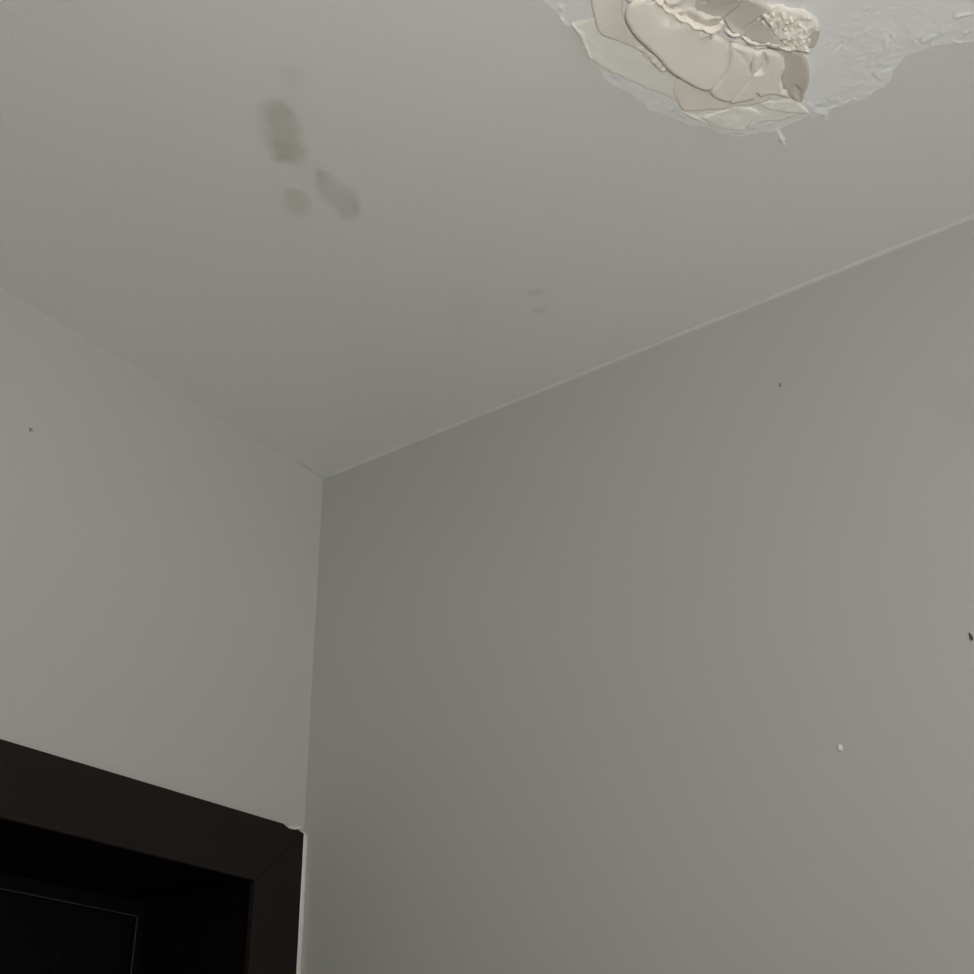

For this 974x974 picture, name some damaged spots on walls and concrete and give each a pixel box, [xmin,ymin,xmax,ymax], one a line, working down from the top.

spalling [571,0,829,147]